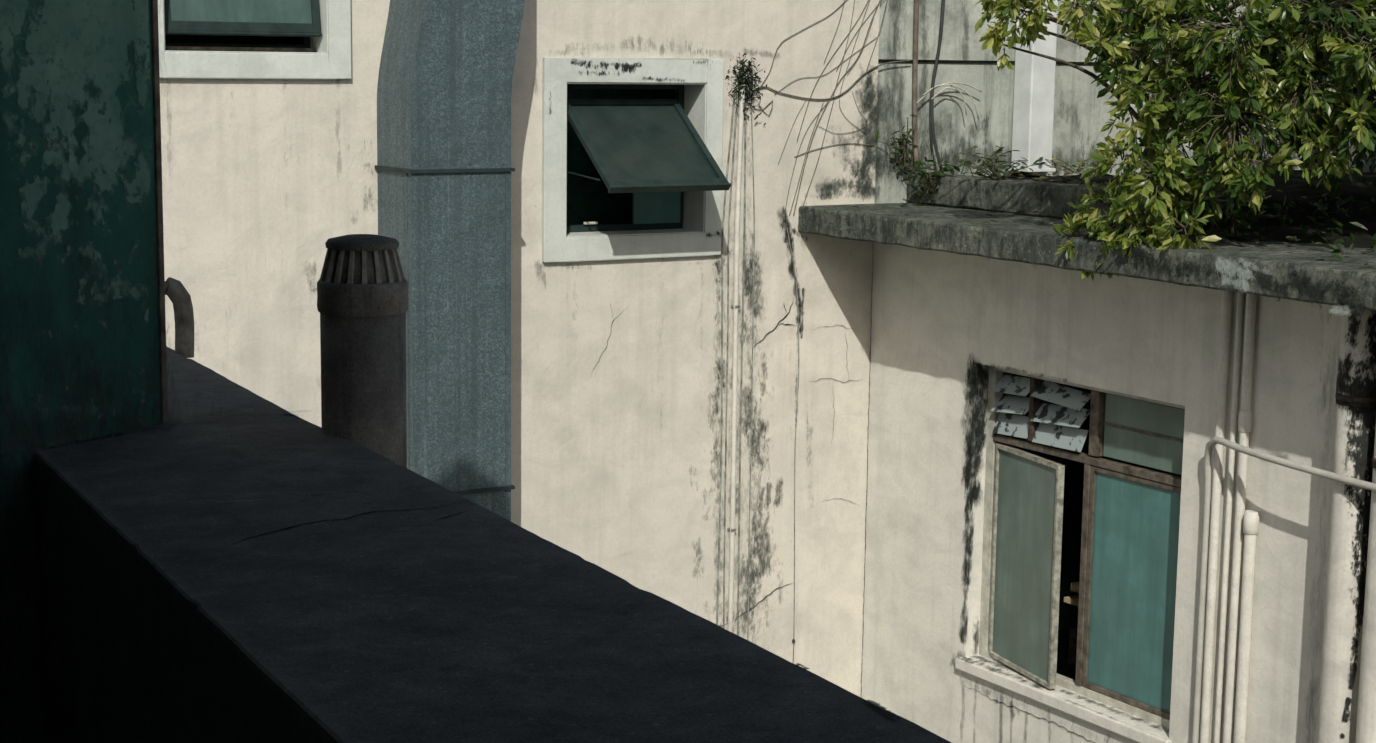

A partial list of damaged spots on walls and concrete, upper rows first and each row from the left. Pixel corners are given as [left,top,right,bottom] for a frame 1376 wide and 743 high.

peeling [0,0,155,323]
leakage [821,0,1022,199]
leakage [743,260,760,330]
leakage [744,364,766,466]
leakage [727,482,782,628]